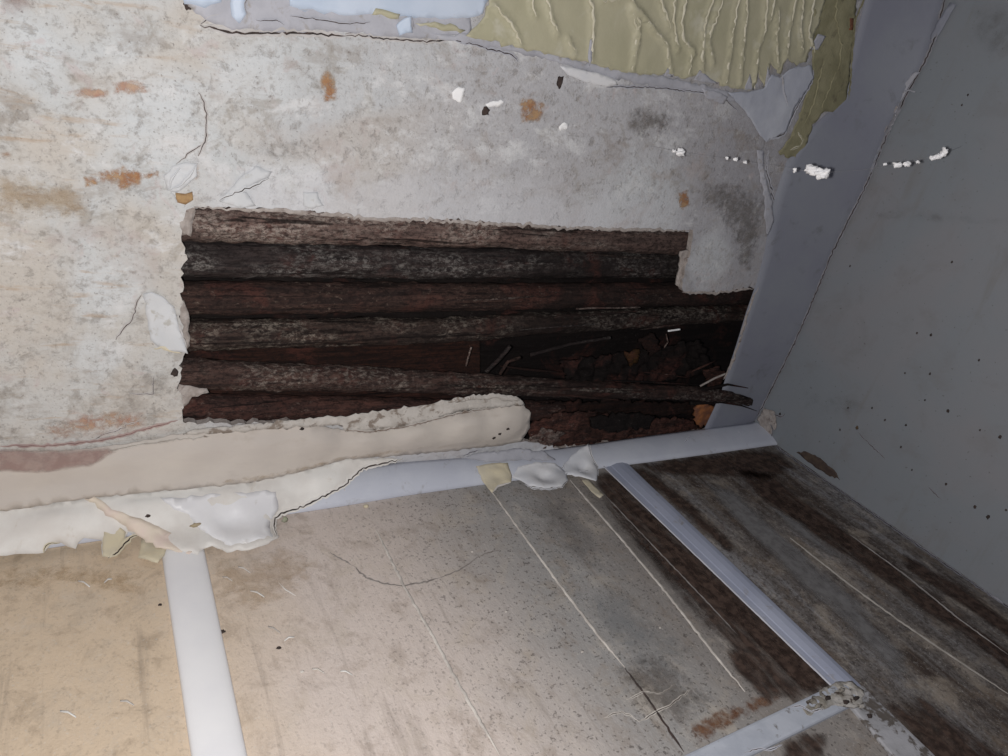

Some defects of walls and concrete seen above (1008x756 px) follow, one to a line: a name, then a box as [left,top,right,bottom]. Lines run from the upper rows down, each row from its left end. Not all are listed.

crack [176,92,209,164]
corrosion [321,72,335,101]
peeling [183,0,864,158]
corrosion [521,99,542,121]
corrosion [85,167,152,188]
flaking render [171,368,209,406]
peeling [476,444,604,498]
peeling [0,457,400,563]
crack [330,550,499,586]
water stain [597,474,828,701]
water stain [634,451,1008,669]
water stain [891,698,1003,756]